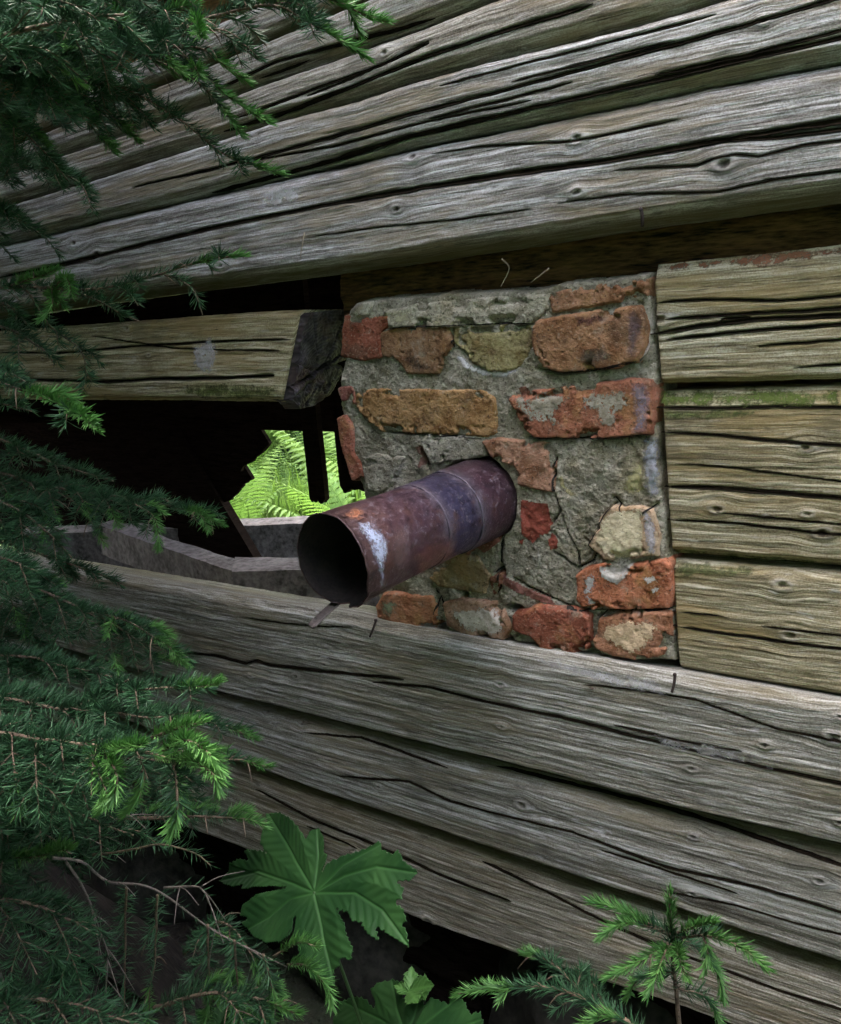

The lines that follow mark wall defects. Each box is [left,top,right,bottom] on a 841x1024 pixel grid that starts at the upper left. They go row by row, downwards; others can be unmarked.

crack [0,0,841,278]
peeling [513,386,570,426]
peeling [582,391,630,426]
crack [529,405,841,570]
peeling [583,509,643,605]
crack [183,651,841,785]
crack [304,732,841,935]